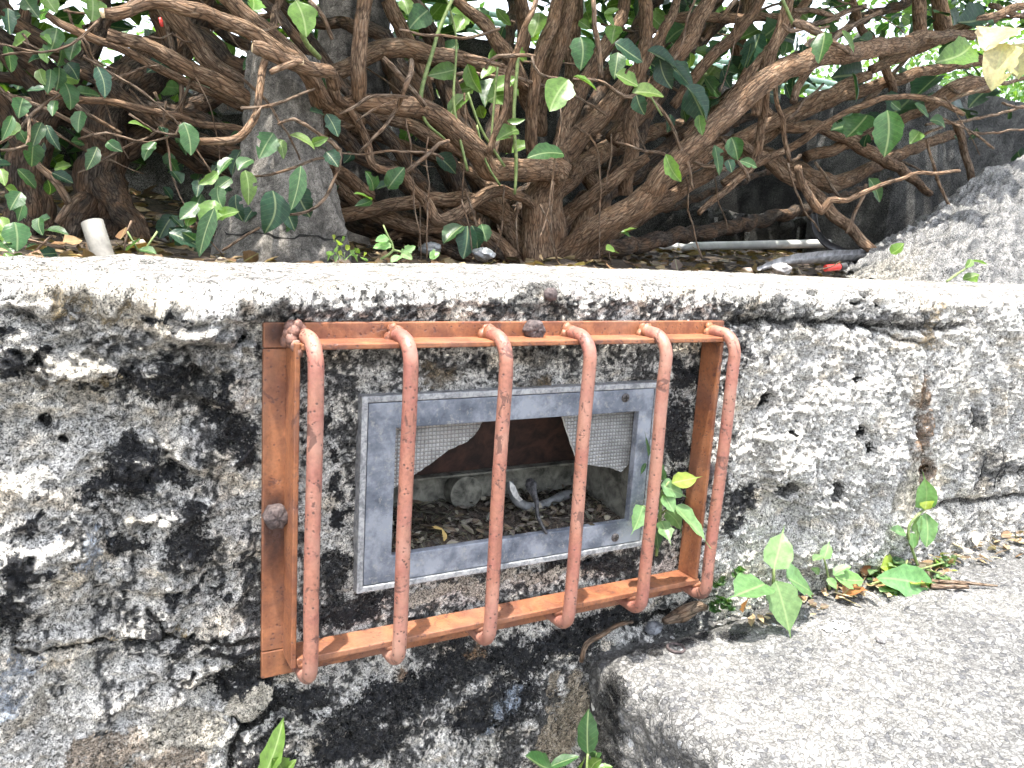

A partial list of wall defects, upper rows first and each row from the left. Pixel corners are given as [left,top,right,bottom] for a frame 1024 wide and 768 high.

leakage [50,287,132,327]
leakage [0,326,197,405]
leakage [140,308,194,327]
leakage [200,375,260,471]
rust [909,374,940,484]
leakage [10,495,61,543]
leakage [0,551,55,724]
leakage [68,429,651,768]